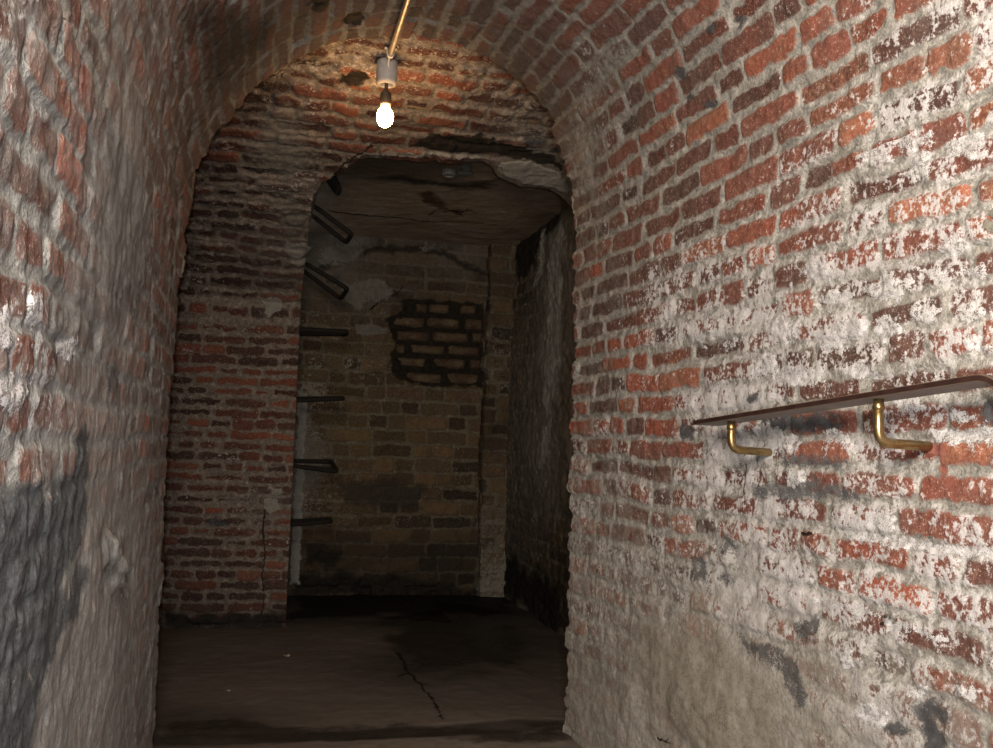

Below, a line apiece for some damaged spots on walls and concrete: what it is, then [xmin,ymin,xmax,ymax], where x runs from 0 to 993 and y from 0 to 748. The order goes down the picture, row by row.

leakage [76,422,90,479]
leakage [70,562,89,621]
crack [259,509,267,615]
crack [396,652,444,719]